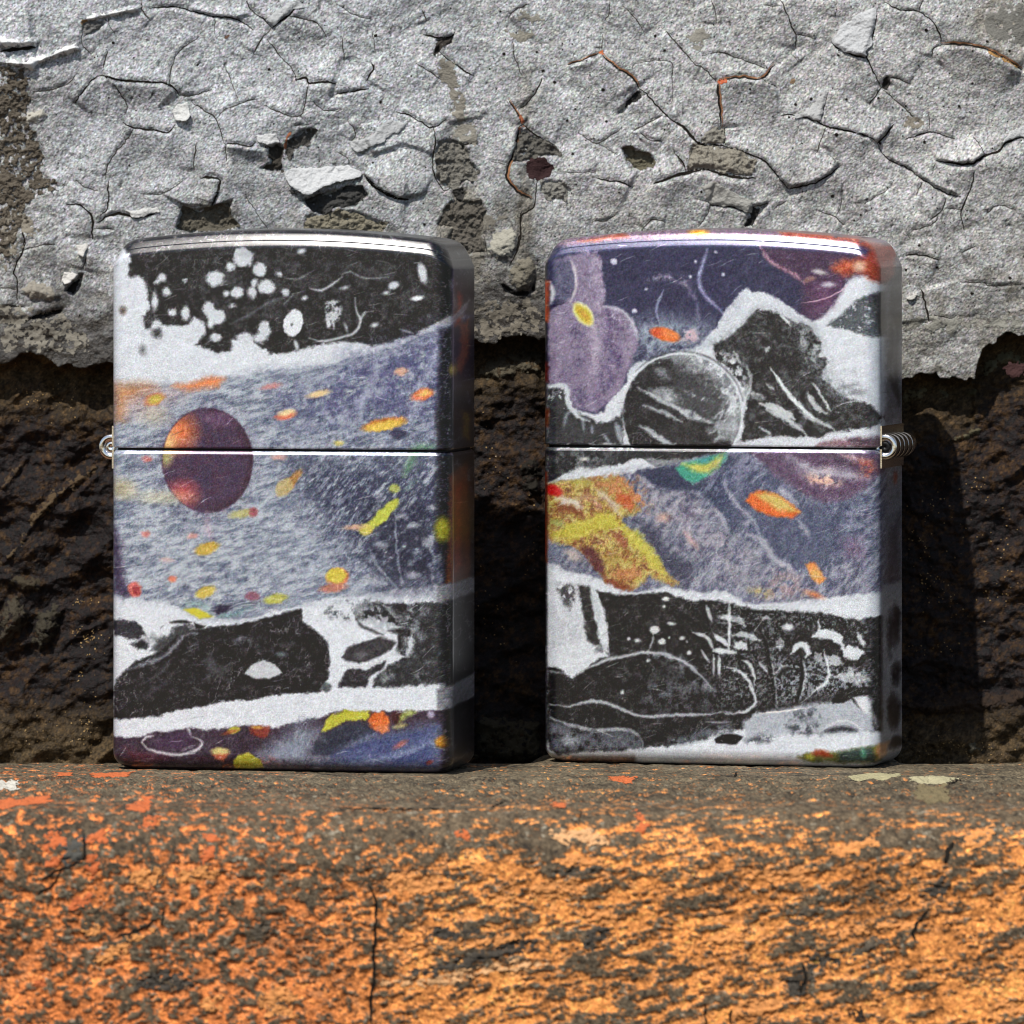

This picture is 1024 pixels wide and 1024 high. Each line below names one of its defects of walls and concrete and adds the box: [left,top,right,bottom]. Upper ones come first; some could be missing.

crack [0,45,36,53]
peeling [0,66,65,258]
crack [34,1,409,267]
peeling [256,133,388,232]
peeling [434,141,486,254]
crack [462,44,555,266]
peeling [512,131,562,162]
peeling [540,179,568,202]
corrosion [567,50,640,86]
corrosion [718,63,774,126]
crack [565,0,1023,260]
corrosion [941,41,1023,69]